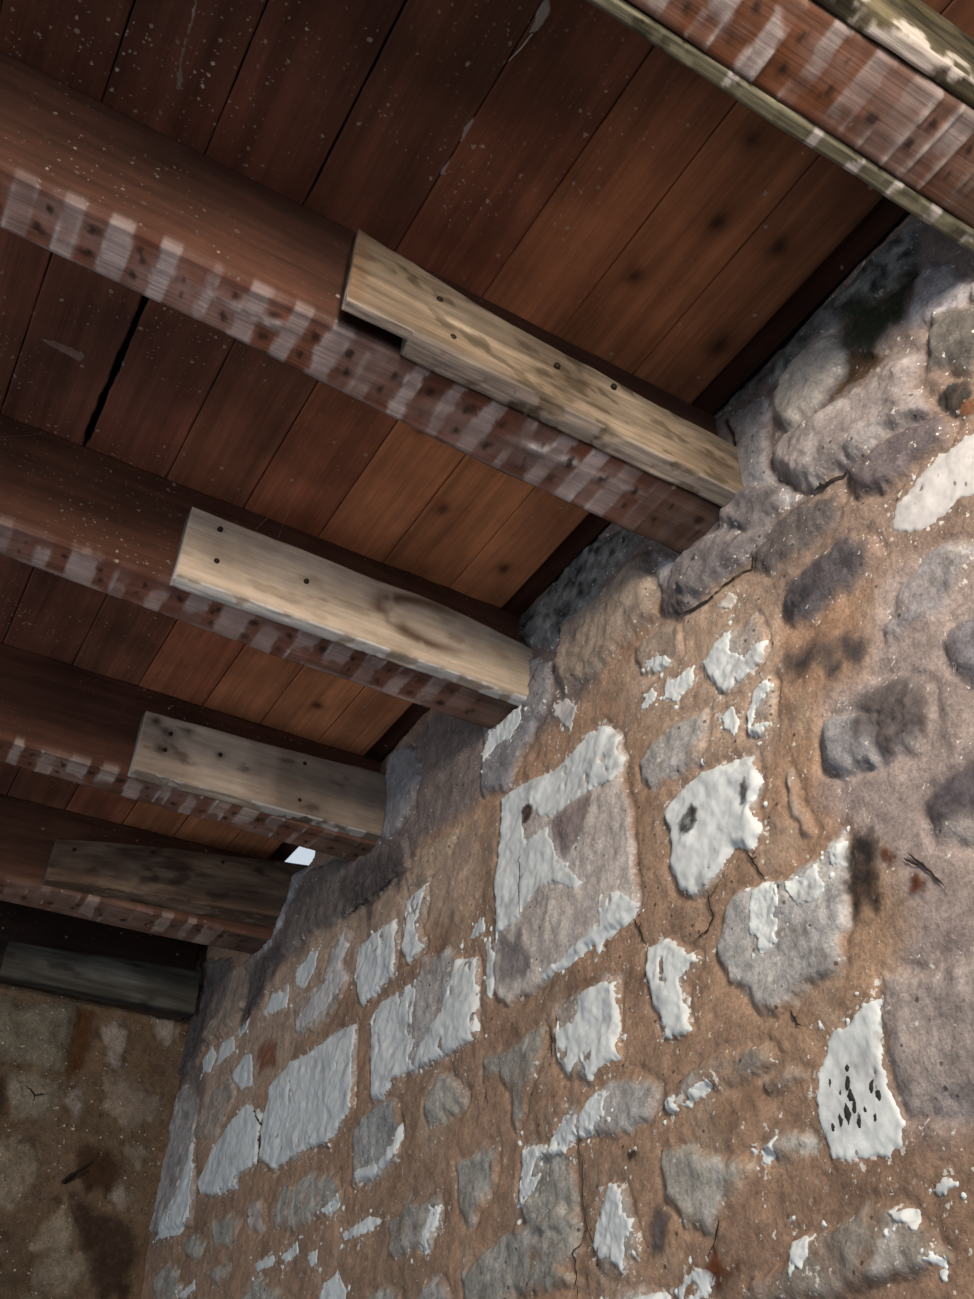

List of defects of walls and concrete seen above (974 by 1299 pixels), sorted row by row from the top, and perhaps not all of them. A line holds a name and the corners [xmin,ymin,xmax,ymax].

crack [680,552,753,615]